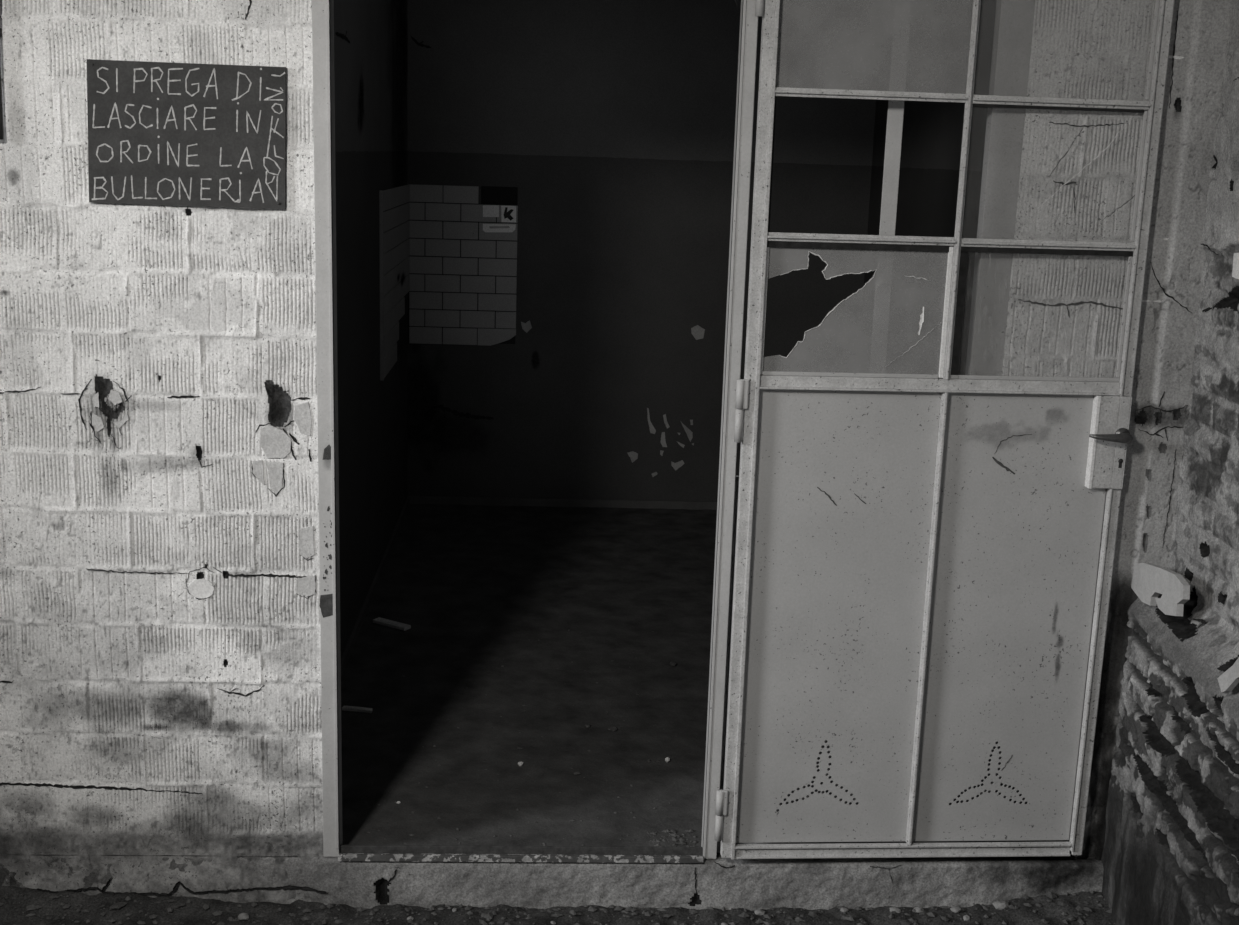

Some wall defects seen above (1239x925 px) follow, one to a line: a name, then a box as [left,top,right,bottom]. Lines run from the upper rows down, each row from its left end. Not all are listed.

spalling [1202,253,1239,313]
hole [60,374,132,449]
spalling [251,380,312,497]
spalling [1135,391,1188,545]
spalling [1142,504,1151,553]
spalling [1155,568,1206,642]
spalling [1217,655,1239,673]
spalling [1145,676,1239,774]
crack [0,782,202,794]
spalling [1130,714,1239,877]
hole [373,869,397,905]